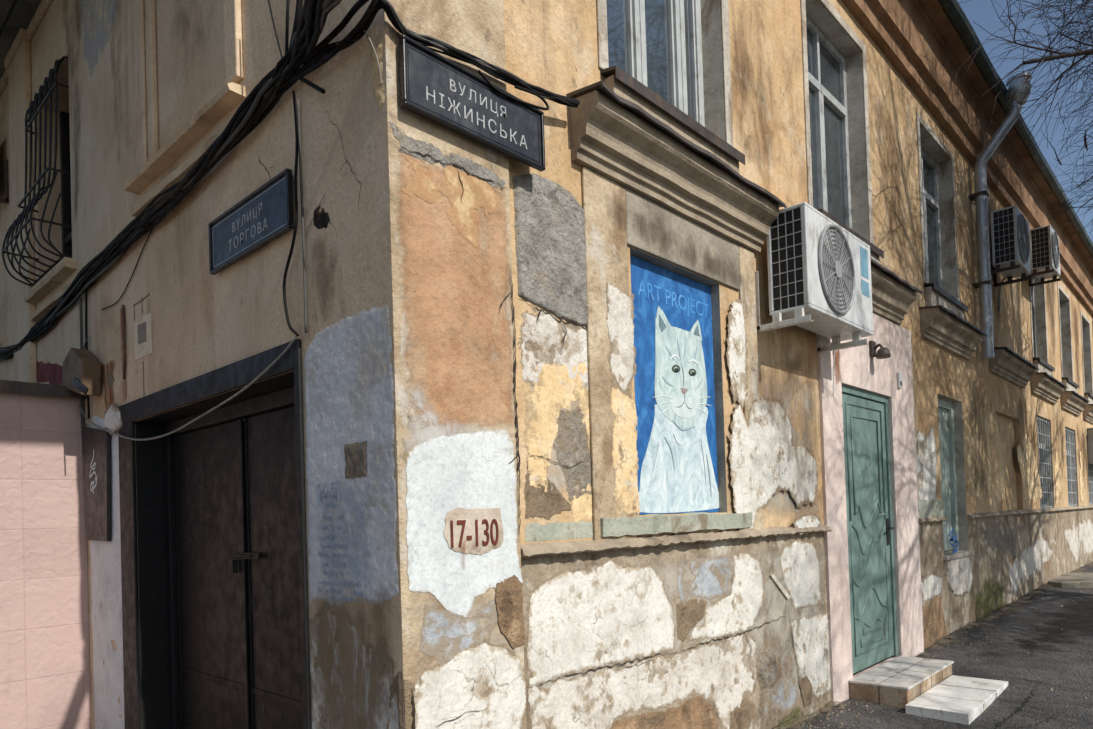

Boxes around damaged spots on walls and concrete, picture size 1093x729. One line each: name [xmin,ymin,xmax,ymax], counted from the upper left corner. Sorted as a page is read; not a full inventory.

crack [304,111,361,237]
hole [313,207,330,229]
peeling [400,154,593,523]
peeling [726,299,821,535]
peeling [344,441,367,479]
peeling [915,425,937,500]
peeling [653,554,822,707]
spalling [387,671,415,729]
peeling [534,657,637,690]
spalling [611,696,755,729]